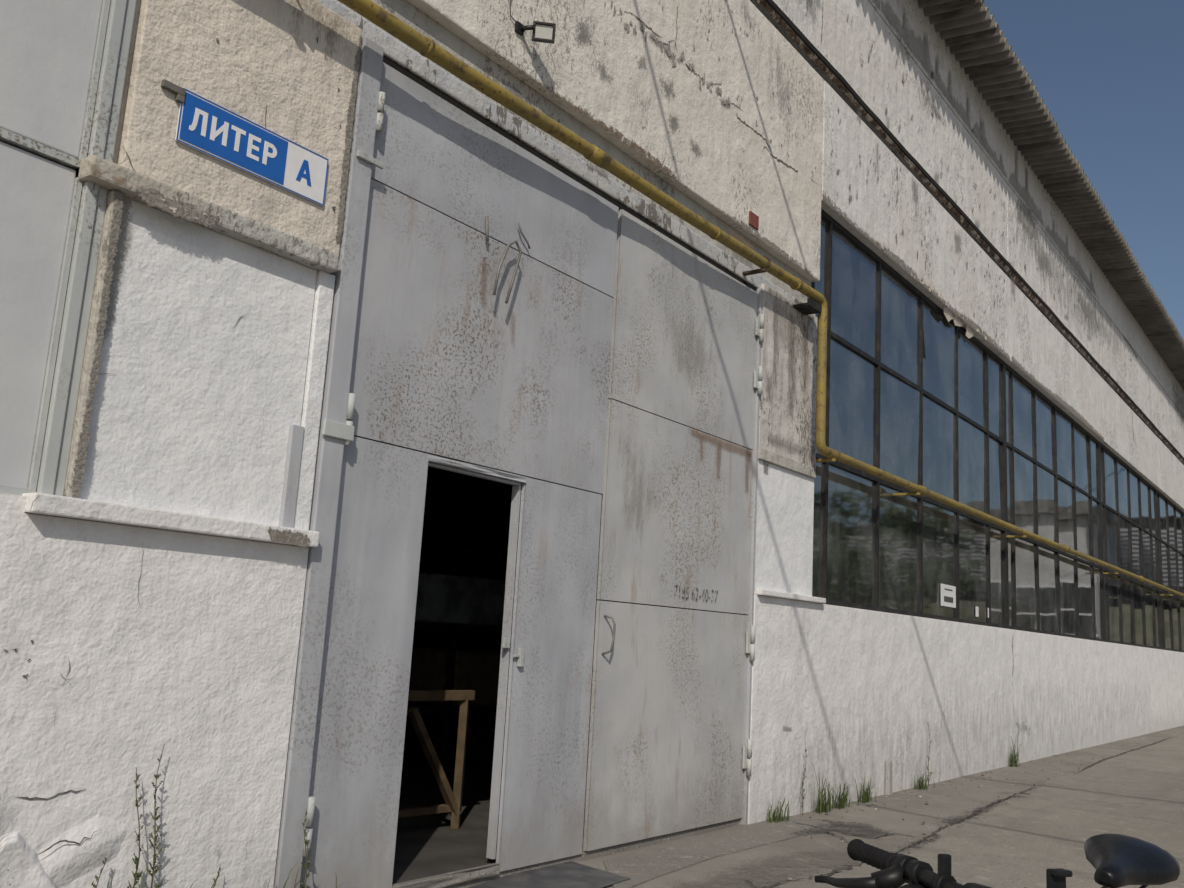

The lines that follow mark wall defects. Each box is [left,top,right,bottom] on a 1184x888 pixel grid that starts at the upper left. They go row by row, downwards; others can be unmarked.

crack [604,1,817,184]
damp [767,315,808,415]
spalling [268,527,310,548]
crack [17,789,86,800]
crack [37,829,101,855]